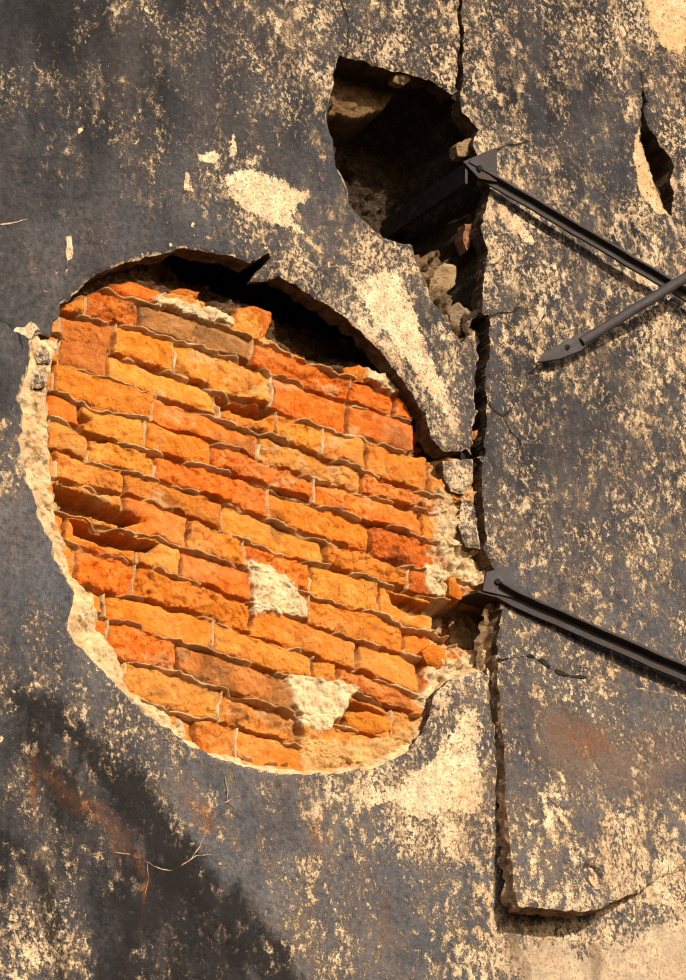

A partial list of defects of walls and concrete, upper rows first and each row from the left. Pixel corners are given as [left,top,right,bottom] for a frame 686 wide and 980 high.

crack [497,141,529,150]
spalling [326,67,482,346]
peeling [65,236,74,271]
spalling [246,246,280,285]
crack [455,297,552,468]
spalling [13,261,490,827]
crack [474,602,590,678]